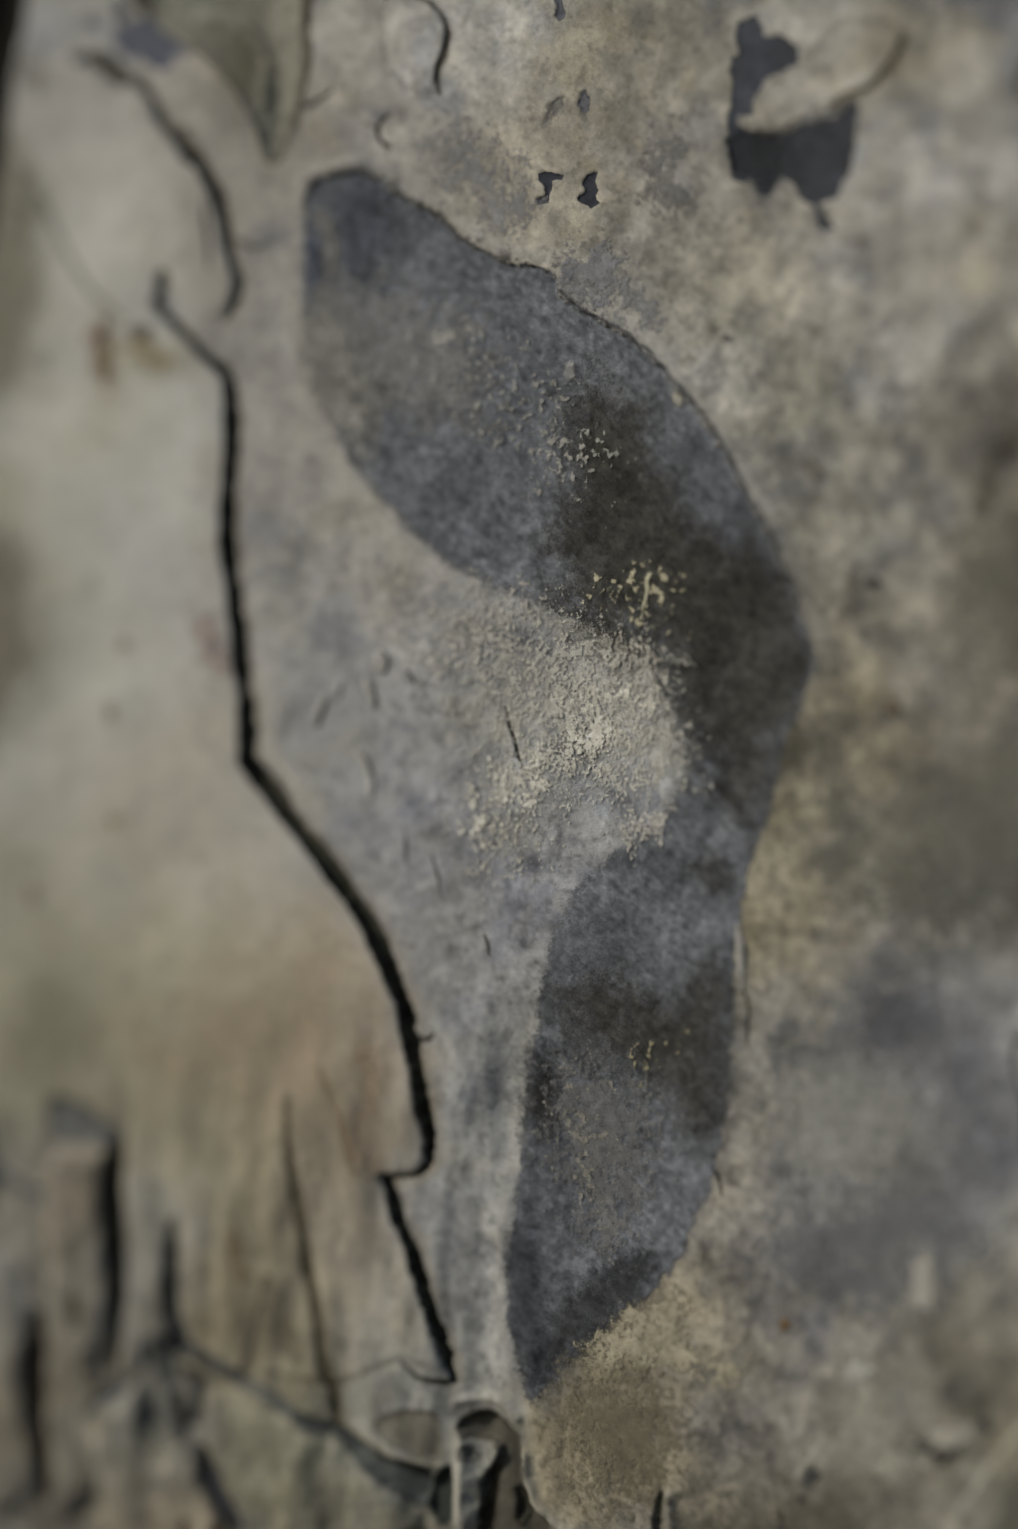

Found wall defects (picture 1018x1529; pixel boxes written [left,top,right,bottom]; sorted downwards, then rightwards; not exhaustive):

spalling [69,0,312,222]
crack [155,101,245,319]
crack [364,113,393,152]
peeling [537,171,563,205]
peeling [577,172,599,208]
peeling [726,15,859,231]
crack [153,271,459,1385]
crack [506,711,522,766]
leakage [288,113,828,1402]